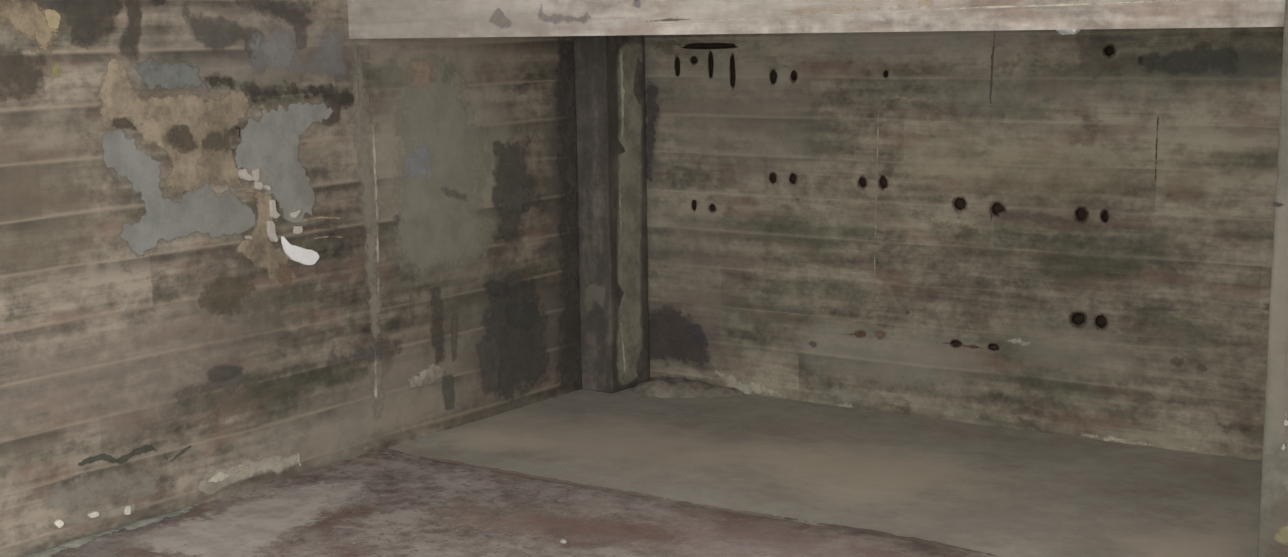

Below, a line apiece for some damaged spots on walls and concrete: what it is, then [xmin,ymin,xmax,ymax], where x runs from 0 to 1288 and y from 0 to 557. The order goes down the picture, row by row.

leakage [0,48,43,100]
flaking render [0,0,61,76]
flaking render [96,57,334,287]
leakage [476,38,782,399]
leakage [430,288,458,410]